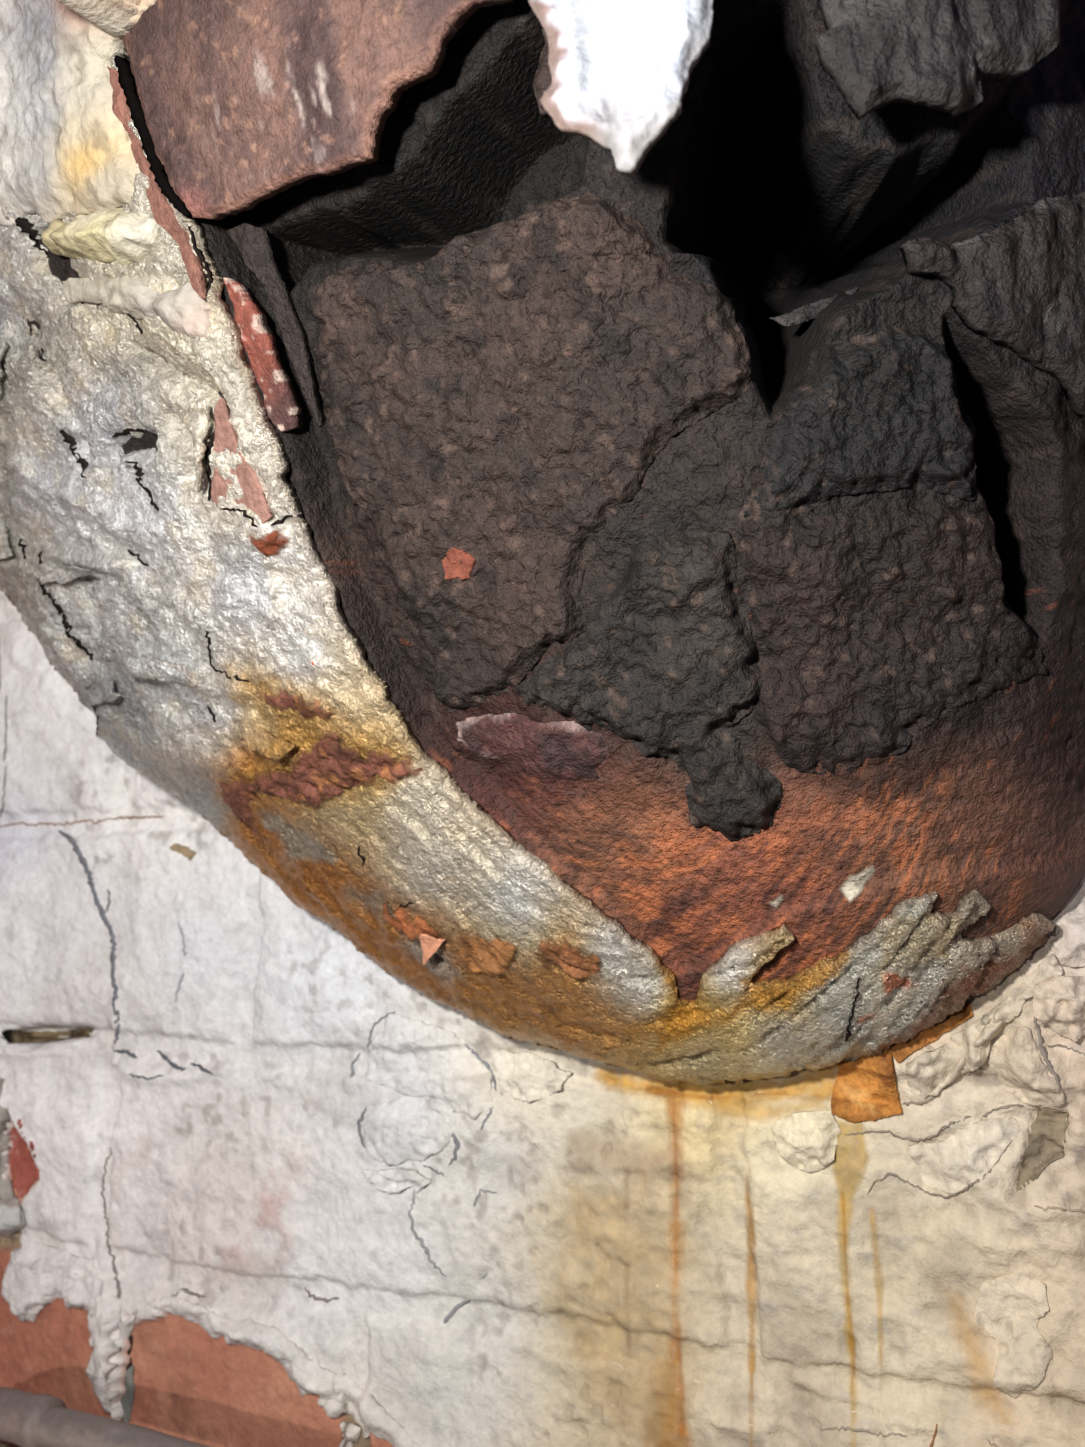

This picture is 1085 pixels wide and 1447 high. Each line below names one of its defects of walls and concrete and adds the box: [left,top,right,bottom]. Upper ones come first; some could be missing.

peeling [528,0,713,175]
peeling [815,0,1060,120]
crack [59,430,89,478]
crack [112,428,159,511]
peeling [131,332,274,524]
crack [18,539,99,736]
rust [220,689,423,856]
crack [0,657,213,1080]
rust [382,903,515,976]
rust [536,941,600,979]
rust [599,1004,973,1281]
peeling [146,1296,421,1447]